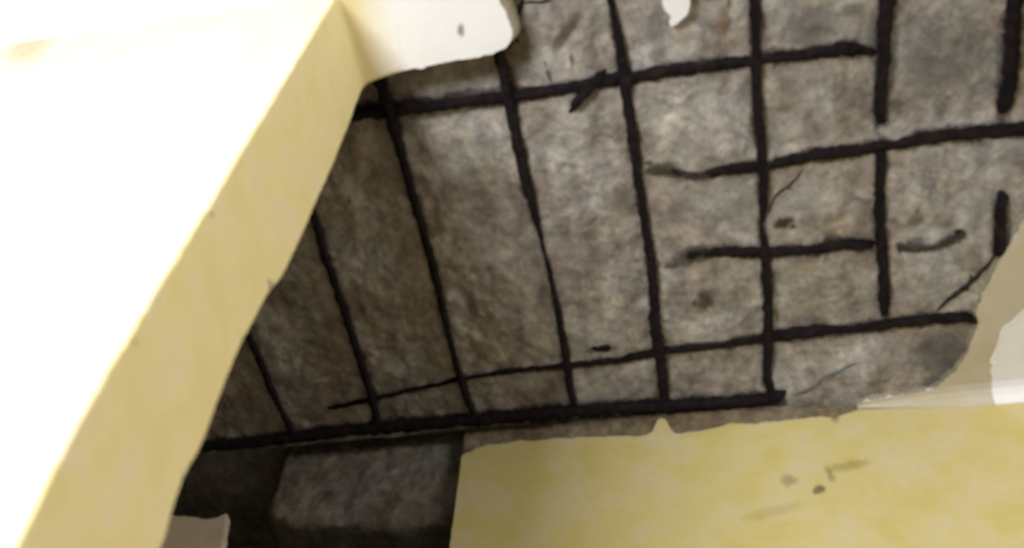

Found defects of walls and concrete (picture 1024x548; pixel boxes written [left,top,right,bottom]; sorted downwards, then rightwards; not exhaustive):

spalling [197,0,1024,456]
crack [792,363,856,396]